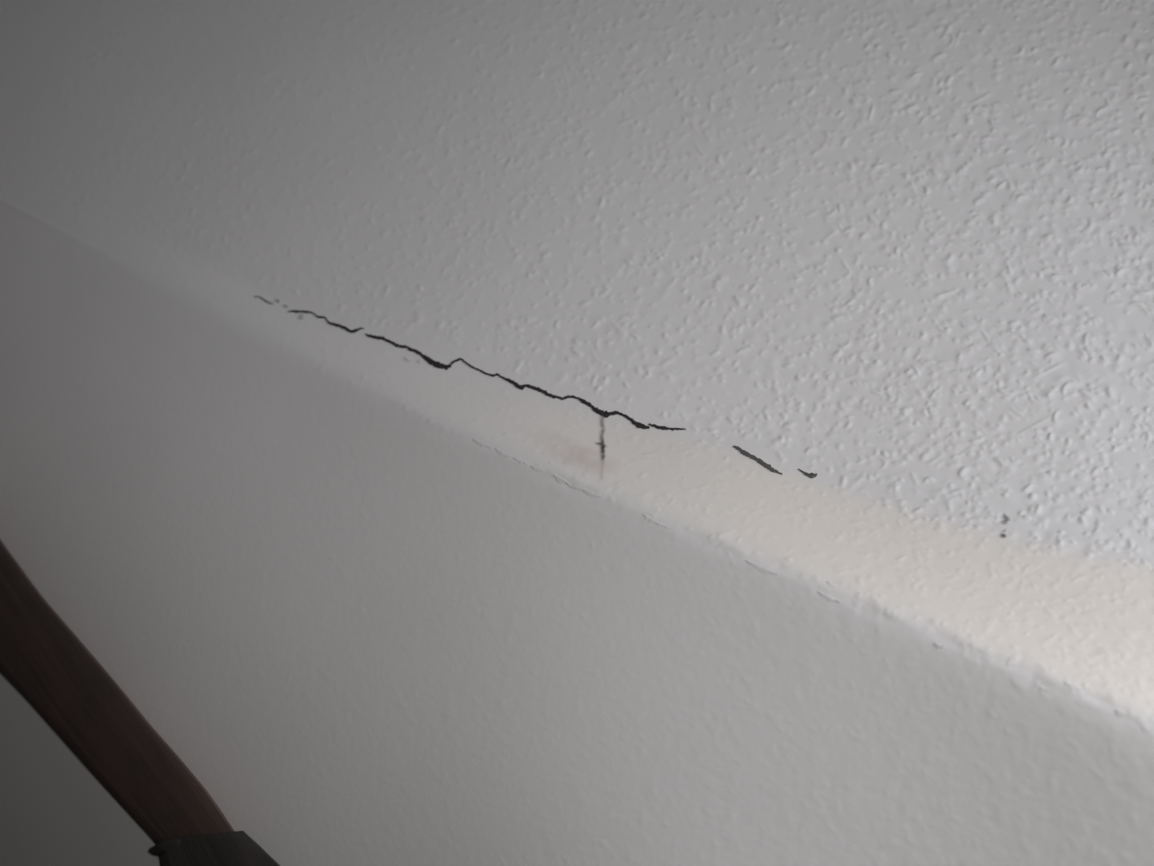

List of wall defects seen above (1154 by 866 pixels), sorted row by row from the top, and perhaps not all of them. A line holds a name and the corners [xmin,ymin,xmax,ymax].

crack [254,296,686,459]
crack [733,446,817,478]